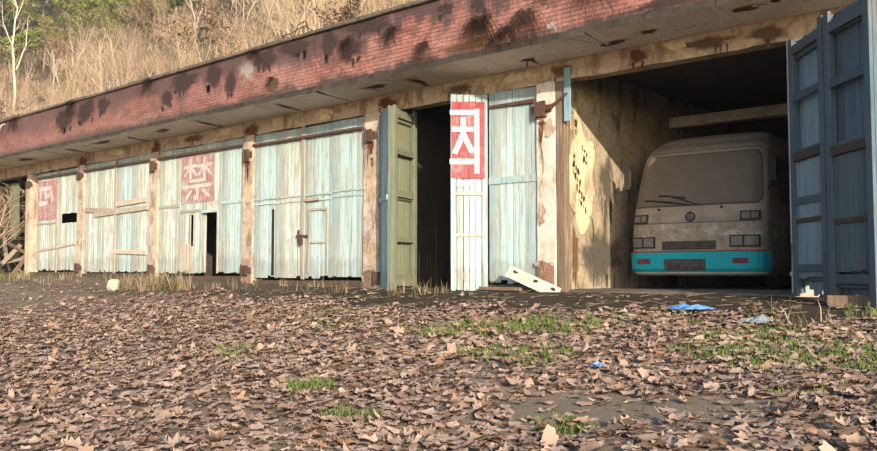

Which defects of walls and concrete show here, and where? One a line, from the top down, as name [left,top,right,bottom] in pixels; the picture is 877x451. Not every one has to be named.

water stain [472,0,487,17]
water stain [323,18,387,66]
water stain [161,40,309,112]
water stain [56,97,109,133]